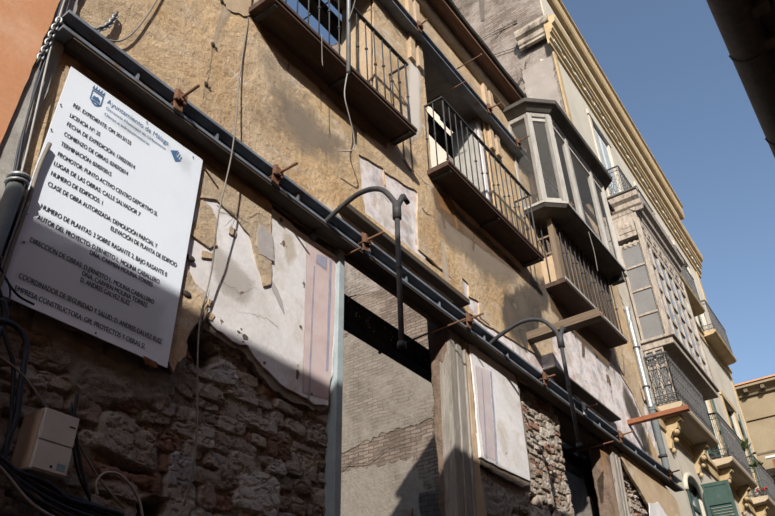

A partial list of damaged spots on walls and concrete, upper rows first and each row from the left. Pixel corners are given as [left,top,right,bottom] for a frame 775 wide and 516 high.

flaking render [193,199,217,241]
flaking render [257,224,287,261]
water stain [438,212,574,349]
flaking render [174,284,223,380]
water stain [573,327,612,367]
spalling [108,459,157,477]
hole [136,493,173,516]